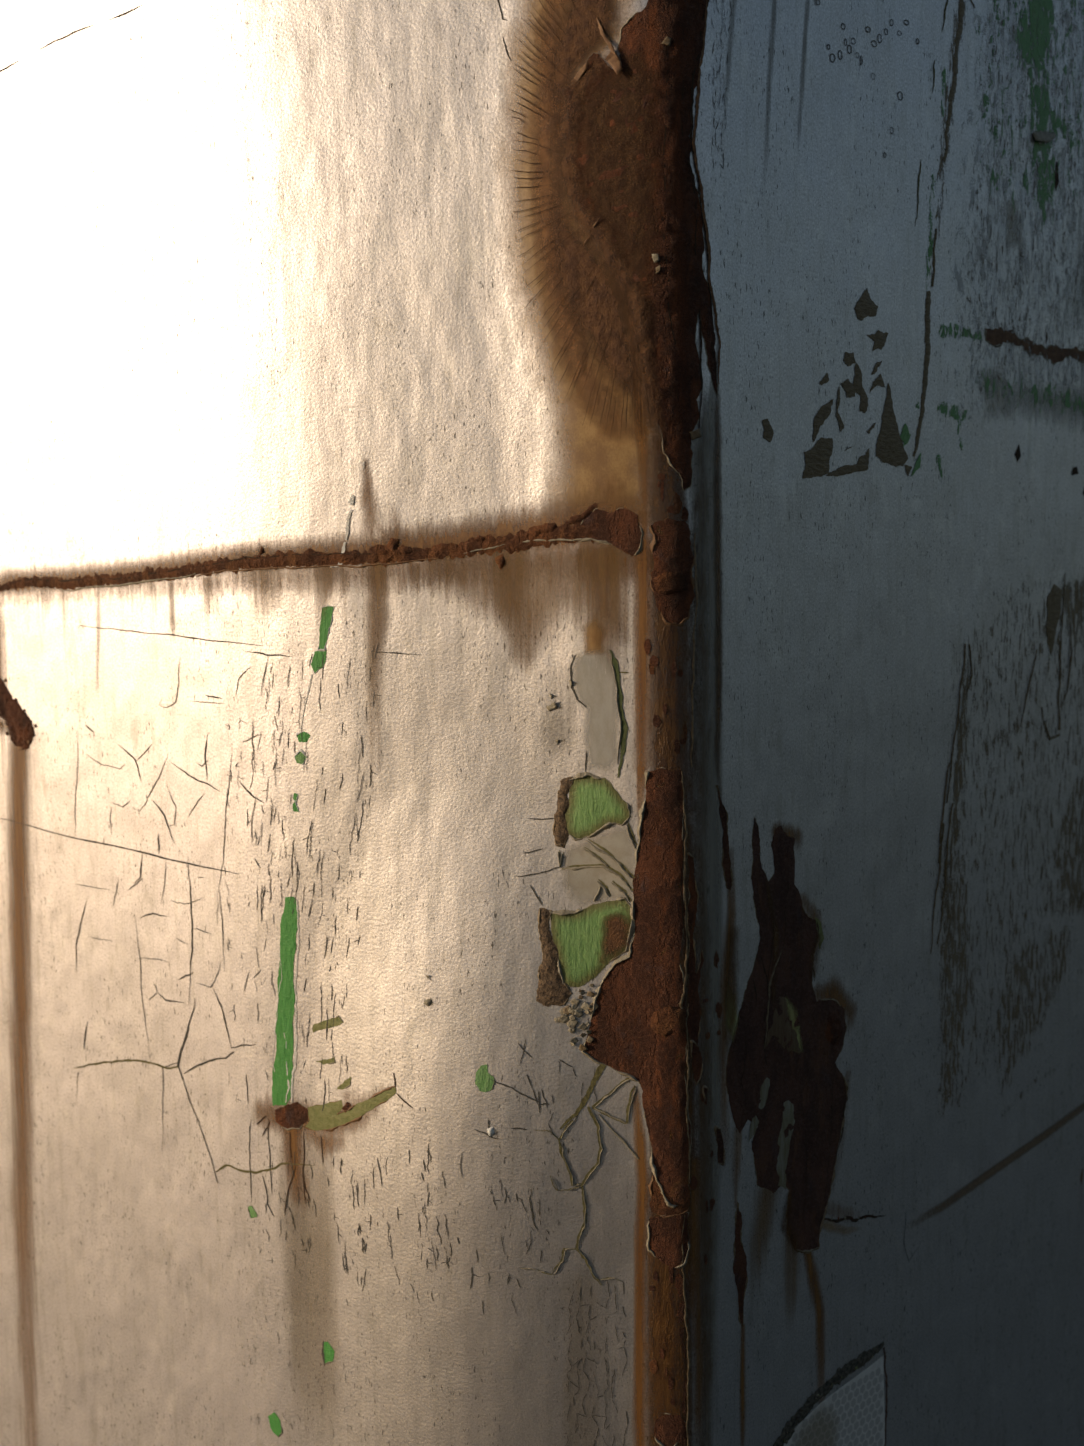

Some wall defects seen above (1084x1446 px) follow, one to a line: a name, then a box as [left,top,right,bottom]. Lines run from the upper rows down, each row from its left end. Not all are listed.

rust [0,698,36,1297]
crack [0,620,639,1446]
leakage [0,463,652,683]
rust [368,538,415,563]
peeling [517,752,640,1052]
rust [510,0,866,1446]
peeling [802,288,912,479]
peeling [937,0,1084,450]